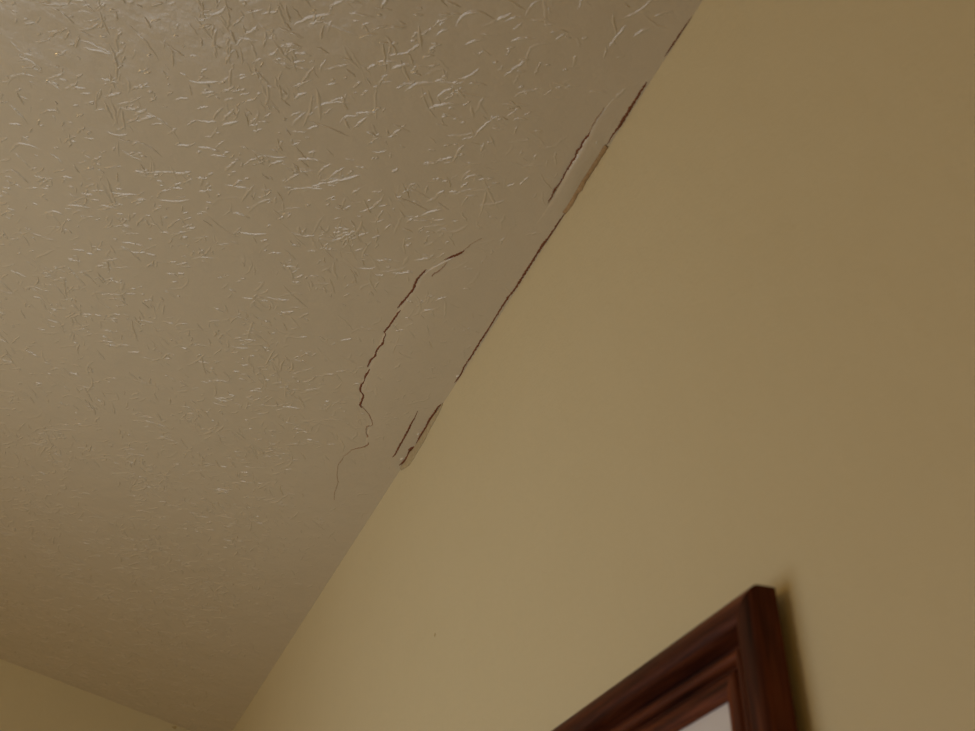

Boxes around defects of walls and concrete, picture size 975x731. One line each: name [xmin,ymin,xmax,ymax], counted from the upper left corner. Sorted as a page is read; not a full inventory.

crack [665,18,691,56]
crack [454,82,647,383]
crack [334,238,482,500]